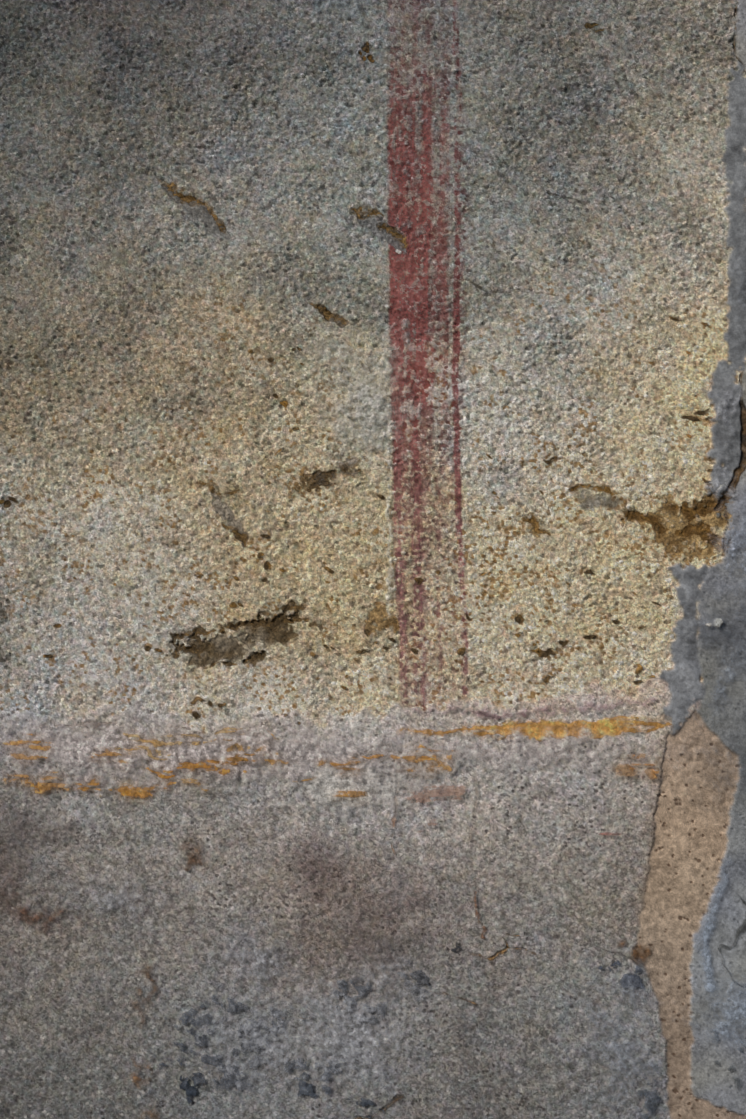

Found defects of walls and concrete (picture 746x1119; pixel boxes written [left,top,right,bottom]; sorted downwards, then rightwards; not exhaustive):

crack [714,372,746,549]
spalling [622,469,731,565]
spalling [144,600,323,673]
crack [718,897,746,986]